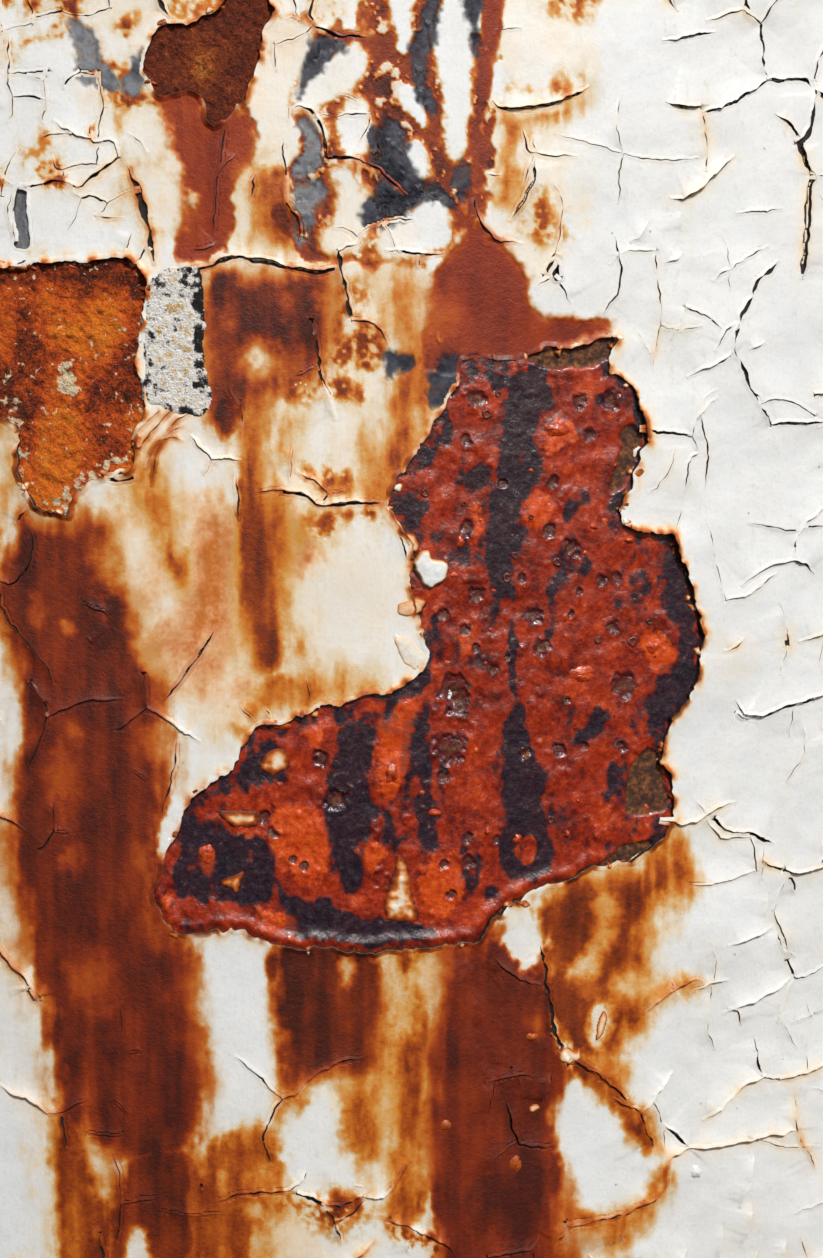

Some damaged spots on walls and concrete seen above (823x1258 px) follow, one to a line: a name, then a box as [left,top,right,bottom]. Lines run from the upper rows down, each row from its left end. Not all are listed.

rust [22,129,65,190]
rust [2,0,88,62]
peeling [0,184,152,522]
peeling [69,0,280,132]
crack [0,0,445,422]
rust [97,0,612,739]
crack [470,0,823,783]
crack [0,508,219,818]
rust [0,424,701,1258]
crack [0,796,823,1258]
peeling [148,331,710,959]